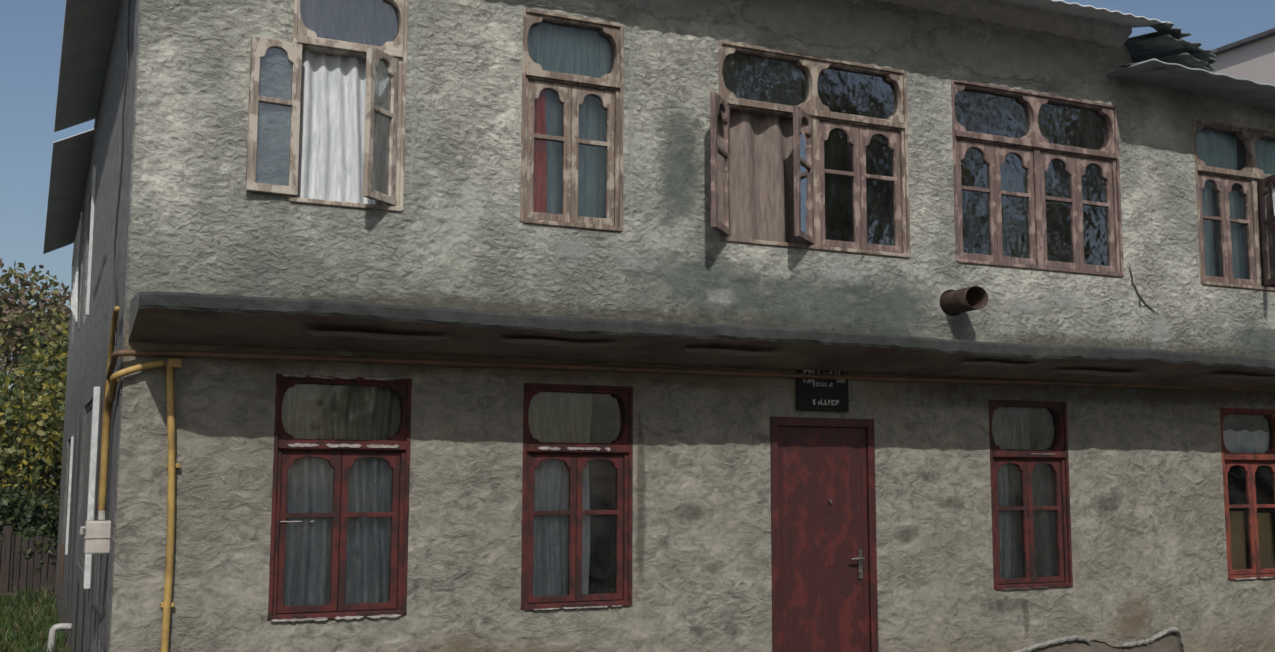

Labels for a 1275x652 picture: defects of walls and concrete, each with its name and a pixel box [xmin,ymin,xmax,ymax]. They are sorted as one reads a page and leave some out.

flaking render [1013,627,1184,652]